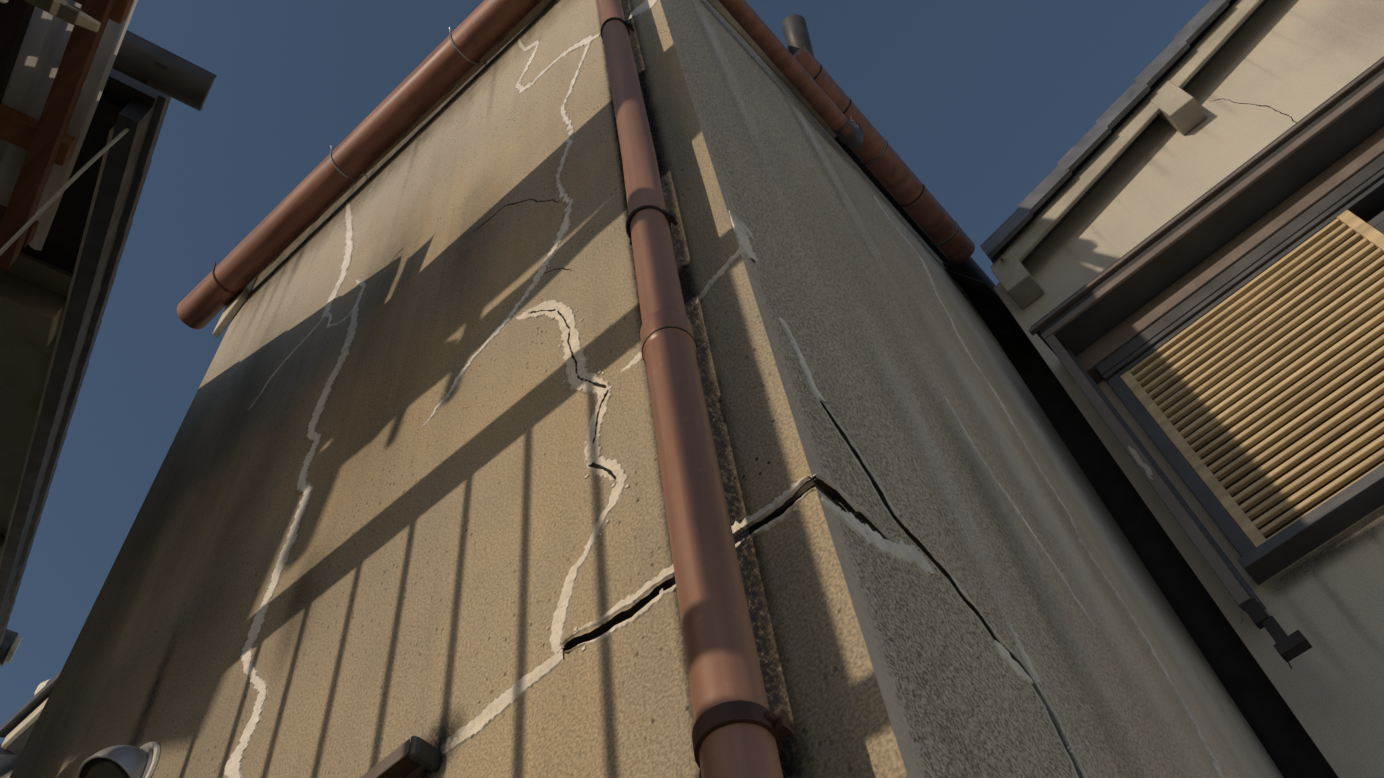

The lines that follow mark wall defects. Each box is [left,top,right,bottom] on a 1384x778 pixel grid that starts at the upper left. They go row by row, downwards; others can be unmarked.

crack [224,201,366,778]
crack [423,0,677,755]
crack [695,247,744,306]
crack [731,317,1088,778]
crack [1213,98,1297,123]